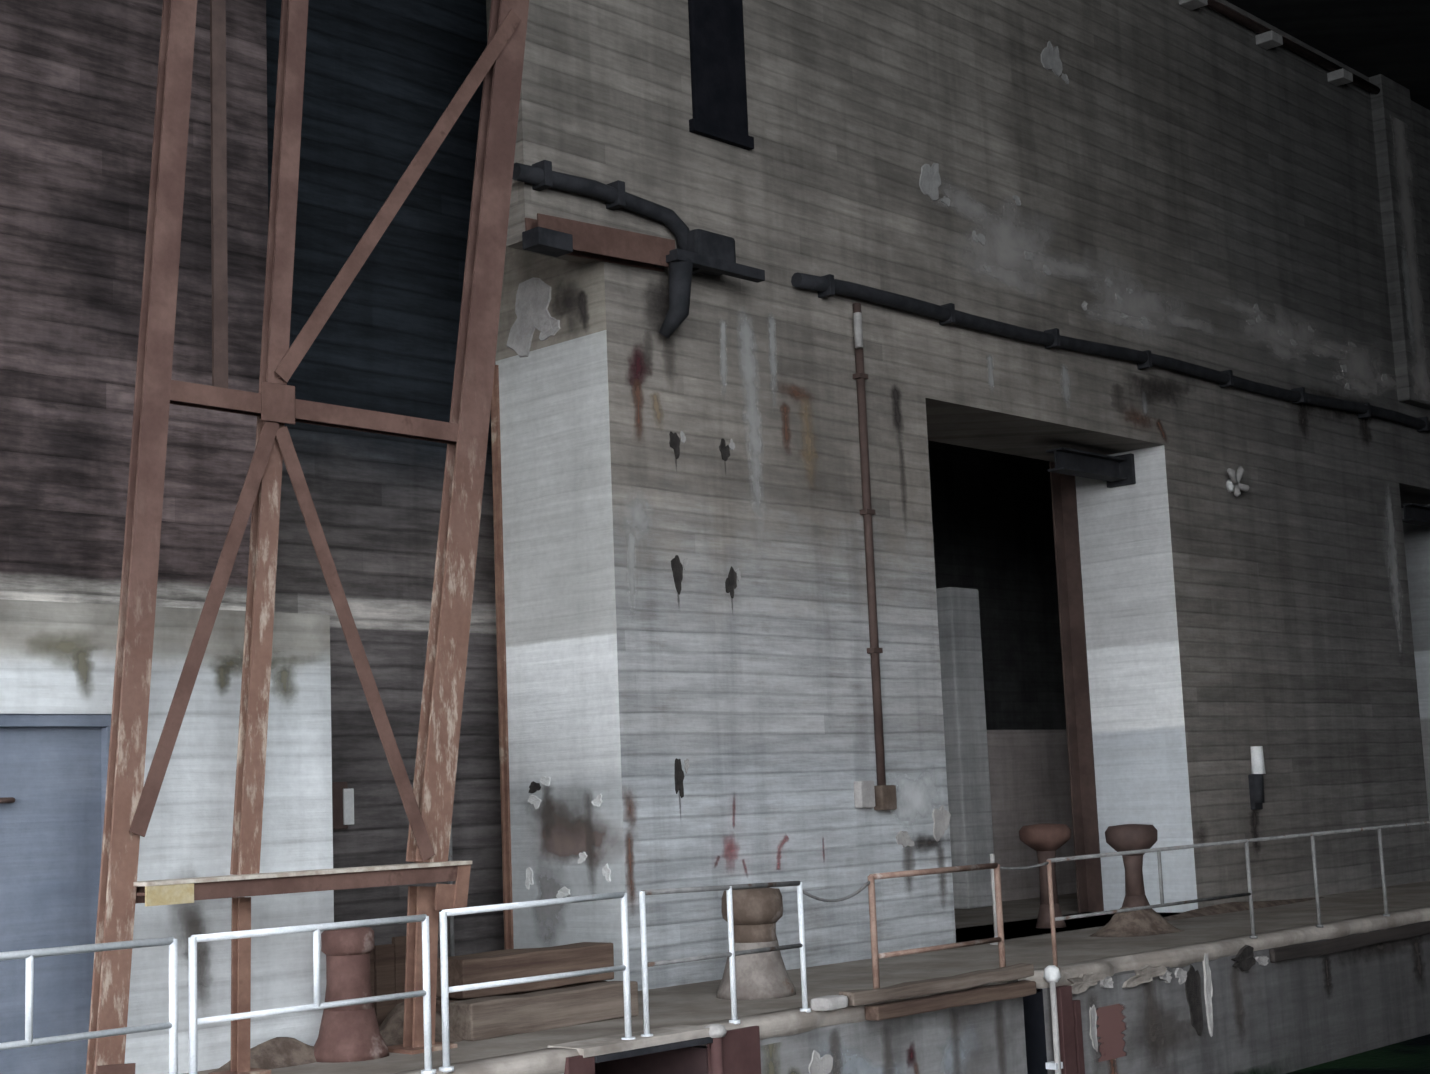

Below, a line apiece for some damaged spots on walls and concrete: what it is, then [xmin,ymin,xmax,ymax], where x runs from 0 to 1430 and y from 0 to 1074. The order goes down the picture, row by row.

peeling [919,163,1212,332]
peeling [506,277,561,358]
peeling [1223,301,1395,394]
corrosion [629,349,661,436]
damp [742,323,760,492]
corrosion [781,385,812,471]
peeling [808,1050,894,1074]